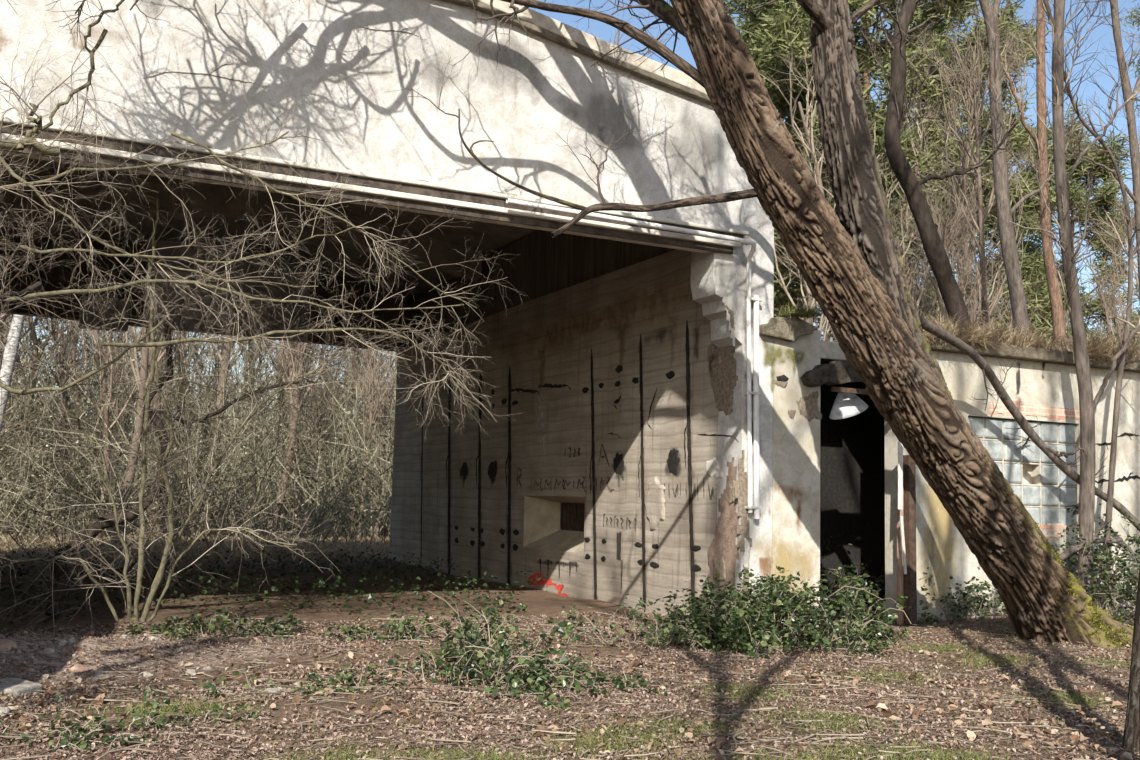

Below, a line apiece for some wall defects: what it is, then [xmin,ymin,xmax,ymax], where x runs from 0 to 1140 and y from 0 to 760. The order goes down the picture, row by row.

water stain [671,135,719,174]
flaking render [987,398,1080,422]
spalling [702,450,752,612]